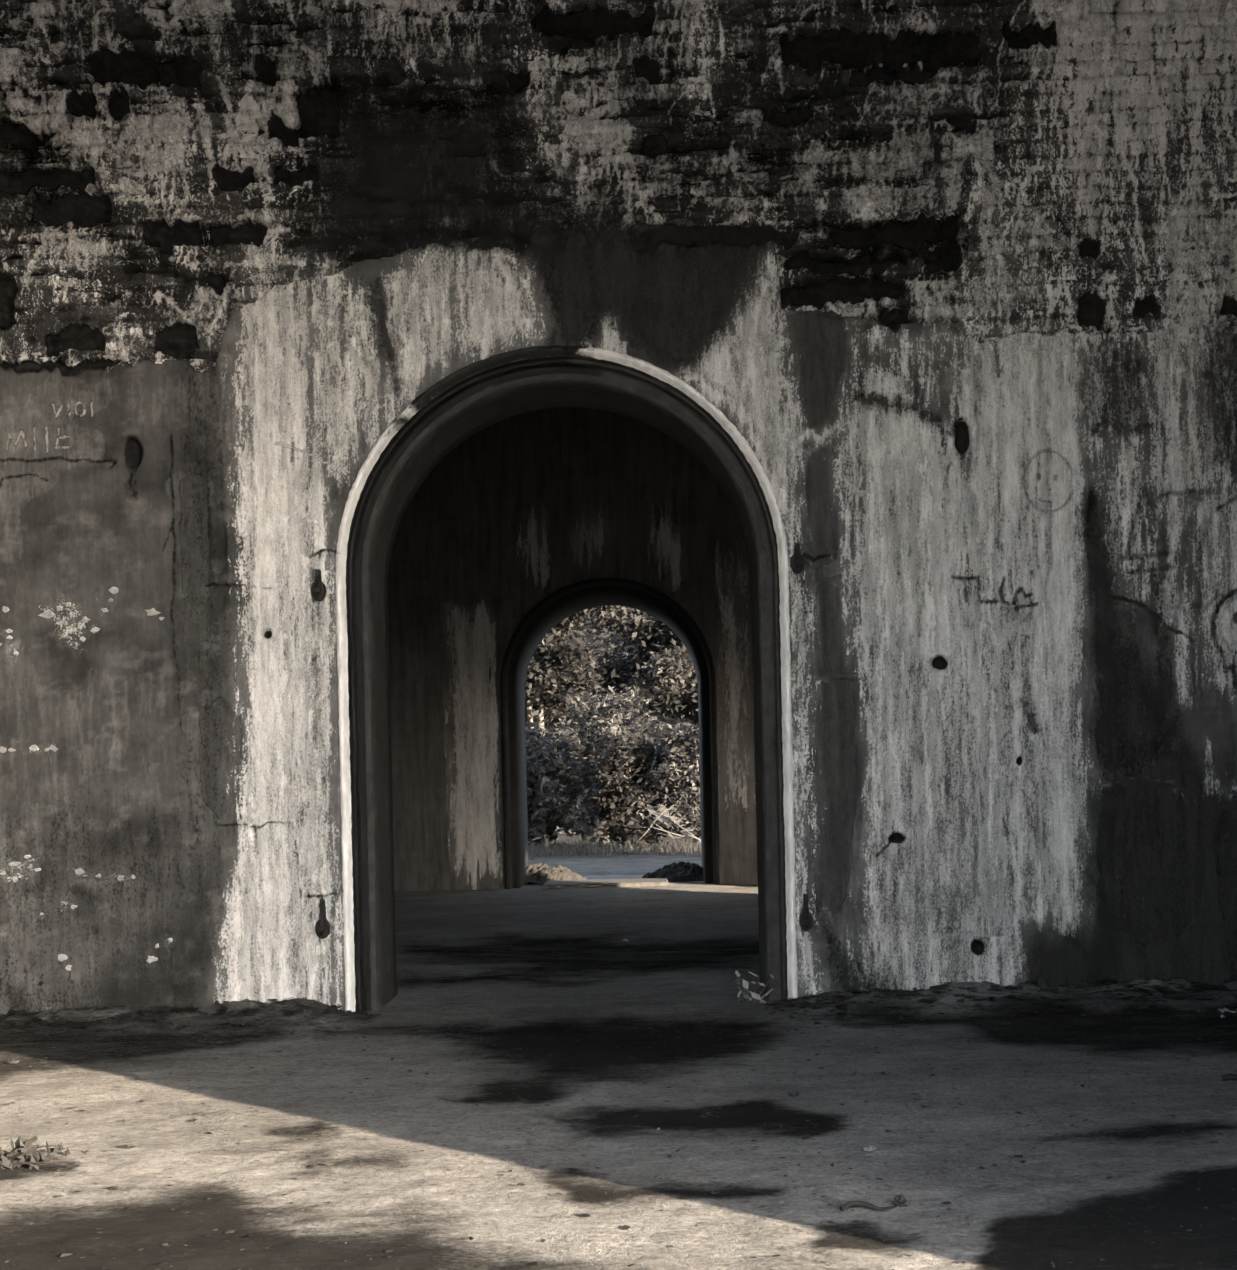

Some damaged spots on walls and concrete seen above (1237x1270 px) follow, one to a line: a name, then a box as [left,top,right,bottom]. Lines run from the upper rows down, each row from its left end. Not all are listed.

spalling [65,49,203,121]
spalling [267,87,341,149]
leakage [313,0,599,227]
spalling [780,27,979,88]
spalling [0,120,113,228]
spalling [143,218,268,255]
spalling [0,322,123,376]
leakage [581,316,627,355]
leakage [0,0,545,1076]
leakage [668,0,1237,1054]
leakage [397,934,759,987]
leakage [321,1012,781,1104]